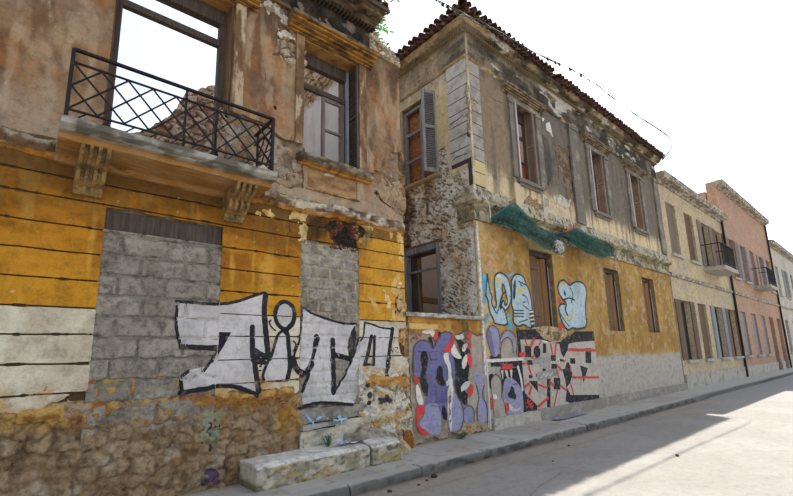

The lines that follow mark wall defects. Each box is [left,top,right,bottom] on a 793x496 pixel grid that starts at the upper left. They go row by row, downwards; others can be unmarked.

spalling [260,0,307,67]
peeling [289,211,308,244]
spalling [372,148,492,376]
spalling [357,271,414,448]
spalling [0,371,304,496]